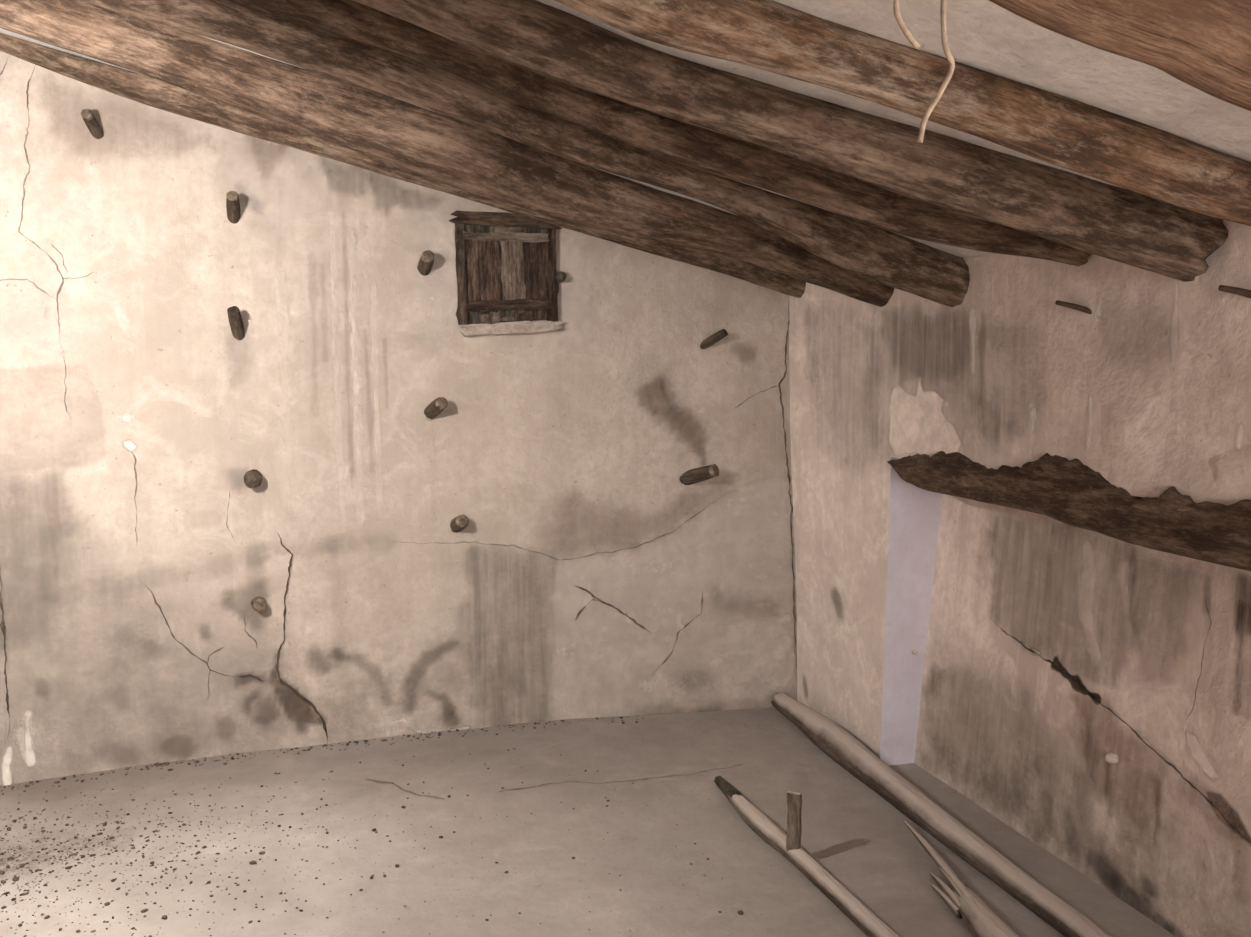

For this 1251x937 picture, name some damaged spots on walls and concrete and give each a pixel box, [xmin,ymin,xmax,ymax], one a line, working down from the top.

crack [0,77,91,320]
peeling [889,380,960,454]
crack [0,567,10,730]
crack [150,534,328,743]
crack [1000,627,1246,838]
crack [1187,606,1212,718]